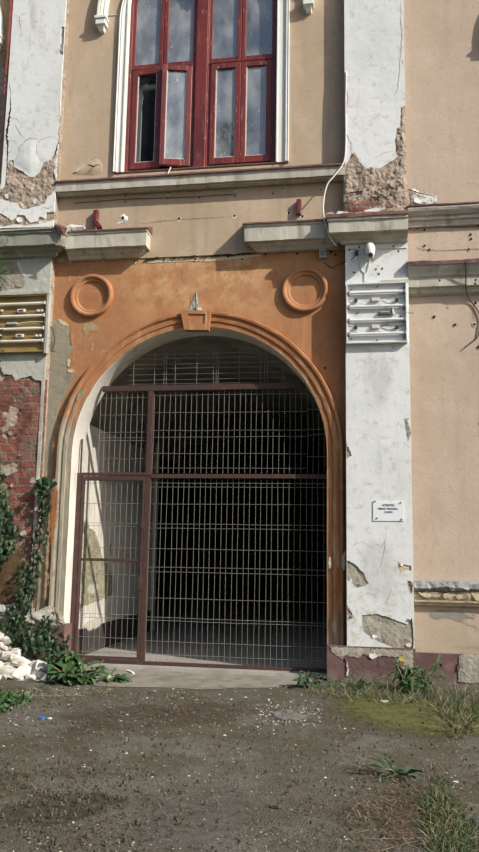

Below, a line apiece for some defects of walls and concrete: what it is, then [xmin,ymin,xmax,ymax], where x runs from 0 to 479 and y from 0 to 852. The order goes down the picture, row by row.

spalling [0,62,8,140]
crack [5,83,60,185]
spalling [0,148,86,247]
spalling [324,107,437,217]
peeling [82,323,99,351]
spalling [0,319,75,625]
spalling [330,606,414,676]
spalling [457,653,479,683]